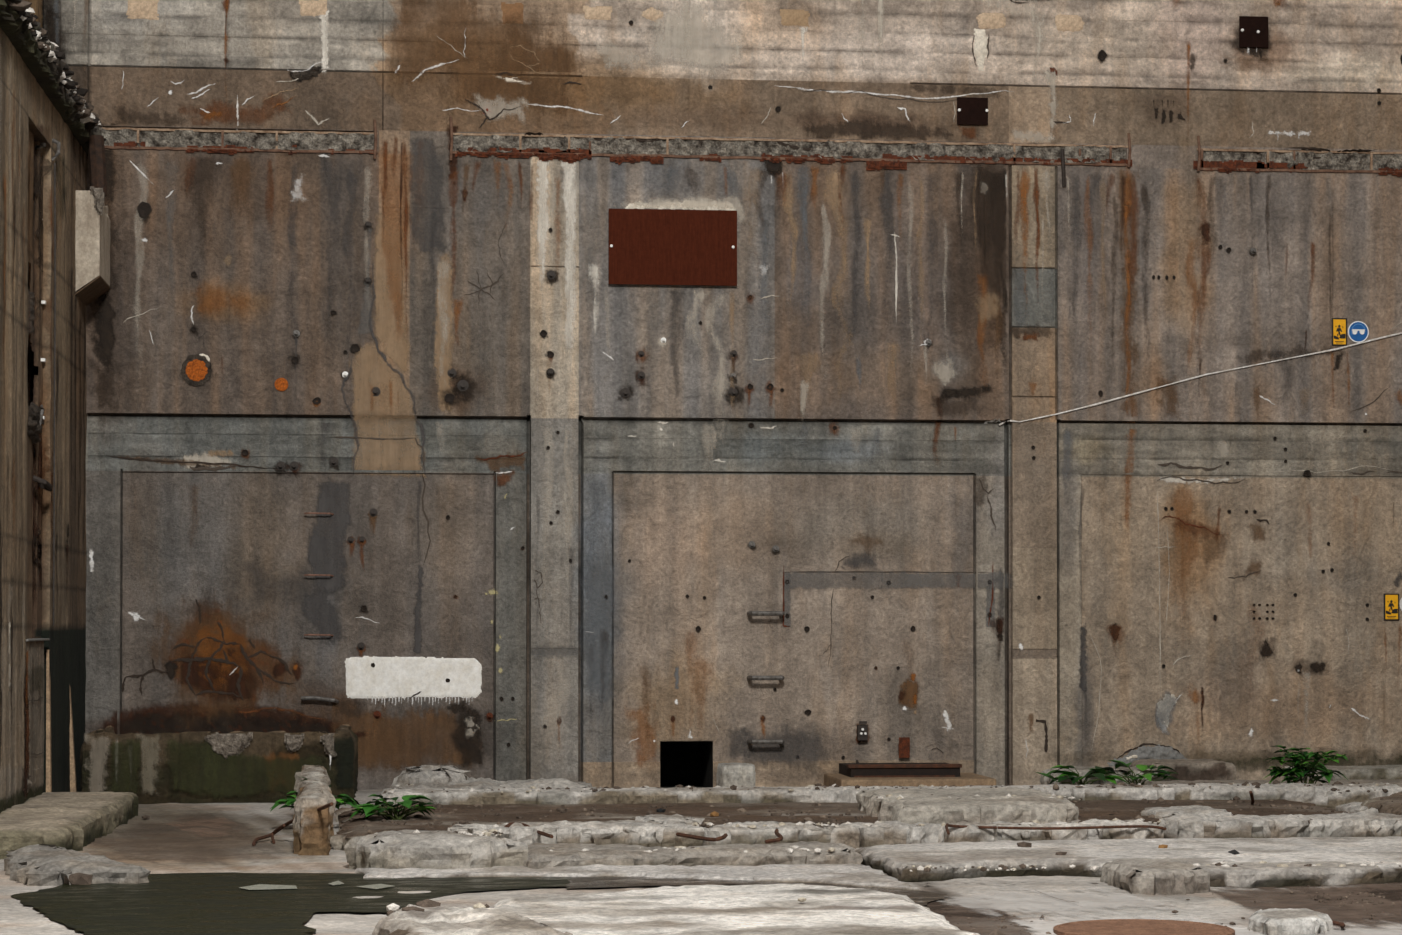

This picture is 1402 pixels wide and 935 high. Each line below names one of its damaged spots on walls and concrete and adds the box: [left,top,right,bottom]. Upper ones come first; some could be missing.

damp [890,234,899,314]
rust [760,153,1137,436]
damp [957,167,1008,357]
crack [336,436,425,472]
crack [480,452,526,486]
rust [162,605,301,713]